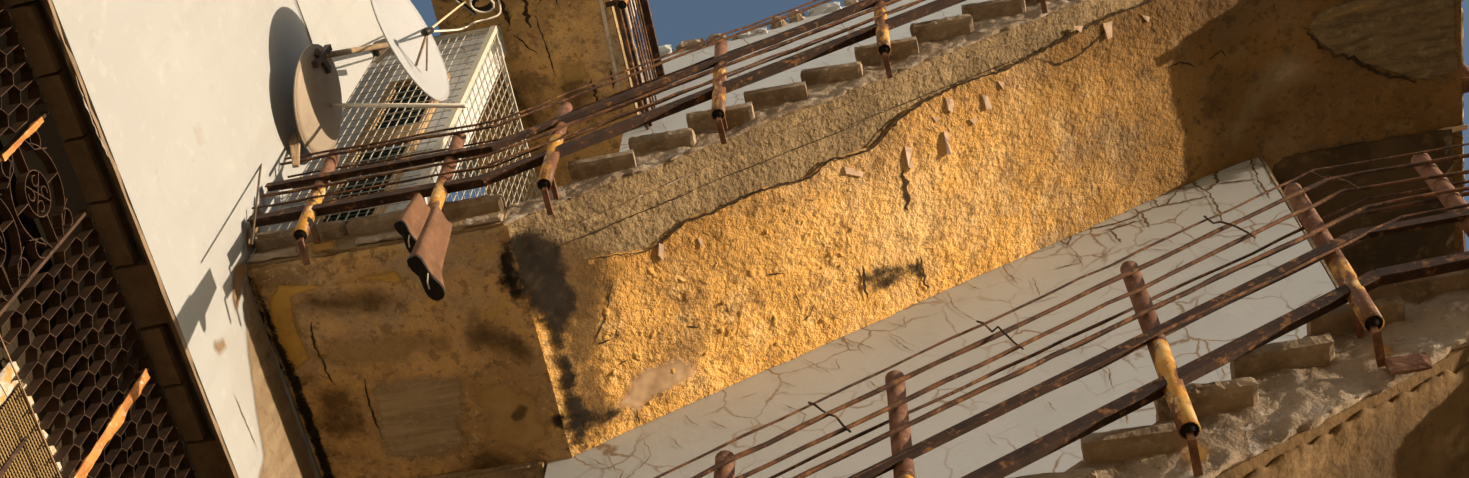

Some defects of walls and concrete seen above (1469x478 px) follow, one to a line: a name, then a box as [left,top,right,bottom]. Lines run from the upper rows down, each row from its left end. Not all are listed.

crack [496,0,615,101]
flaking render [1103,21,1113,40]
flaking render [932,97,954,155]
flaking render [969,81,1004,125]
flaking render [844,167,863,177]
crack [559,0,1154,365]
damp [862,256,929,298]
crack [947,159,1270,320]
damp [496,229,695,450]
crack [589,273,910,478]
crack [1058,334,1155,423]
corrosion [1185,443,1207,462]